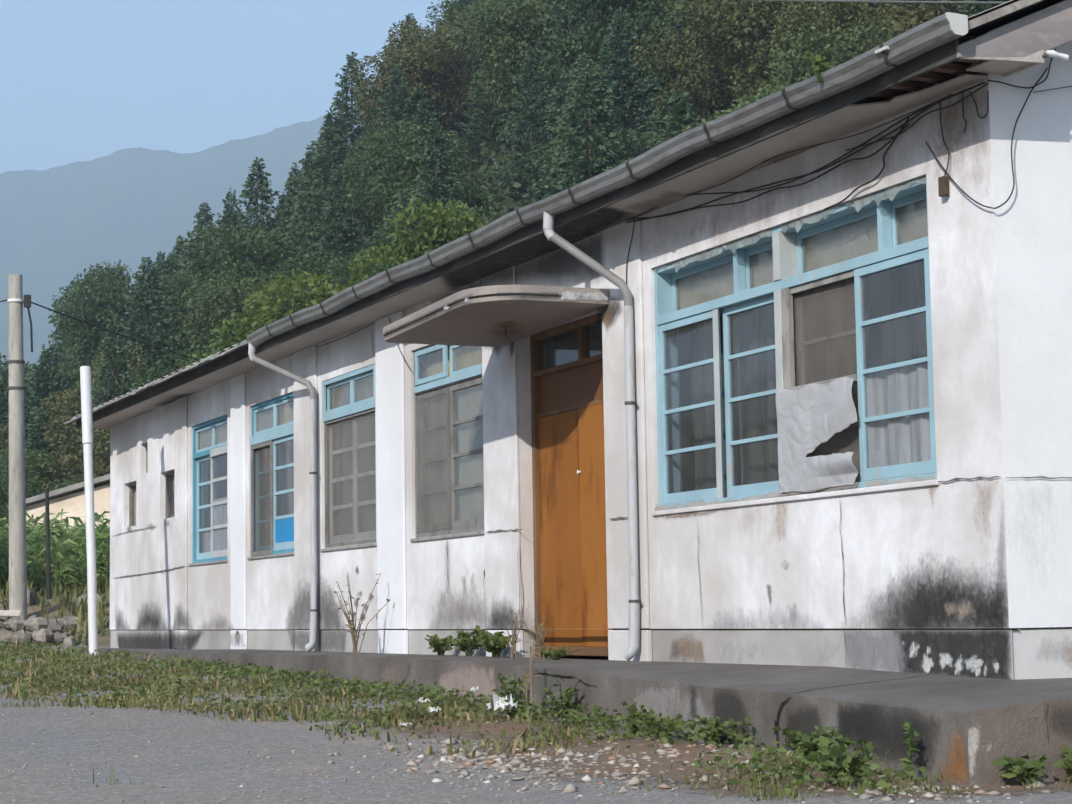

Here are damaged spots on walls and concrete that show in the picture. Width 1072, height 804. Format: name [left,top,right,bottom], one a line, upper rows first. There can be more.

crack [938,475,1072,483]
damp [117,610,200,649]
damp [289,586,345,651]
crack [838,507,848,666]
mould [847,576,1010,680]
peeling [910,642,999,676]